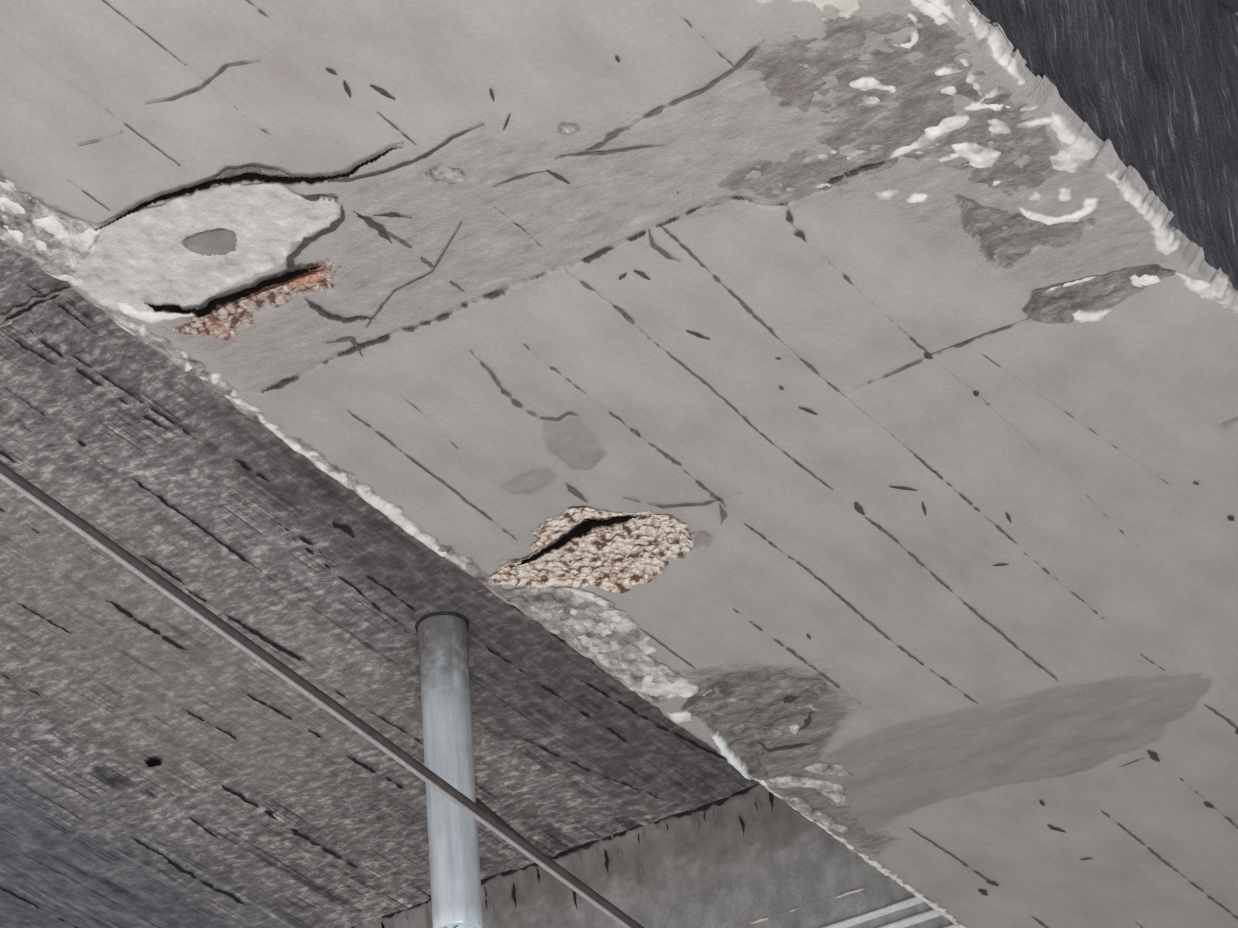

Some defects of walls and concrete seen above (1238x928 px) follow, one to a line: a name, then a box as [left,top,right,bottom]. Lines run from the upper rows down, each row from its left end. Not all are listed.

spalling [891,0,1026,85]
crack [93,124,485,231]
crack [144,222,505,393]
crack [357,213,412,244]
crack [494,46,759,187]
damp [113,0,1185,398]
crack [582,196,807,263]
peeling [887,59,1099,186]
spalling [954,188,1098,270]
spalling [1023,170,1238,323]
spalling [0,172,966,928]
damp [820,670,1216,835]